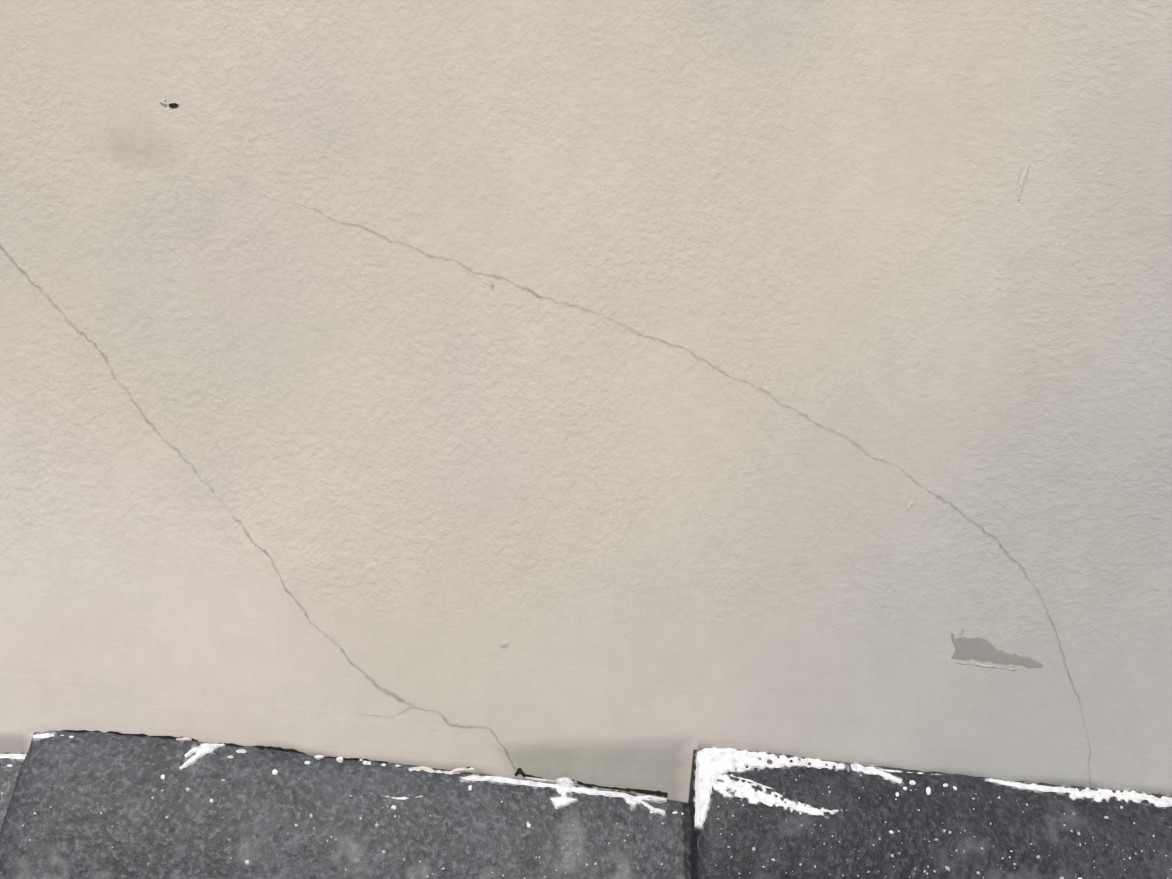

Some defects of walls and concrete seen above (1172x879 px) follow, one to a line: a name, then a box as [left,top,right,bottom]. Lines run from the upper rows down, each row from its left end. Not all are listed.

peeling [952,632,1042,671]